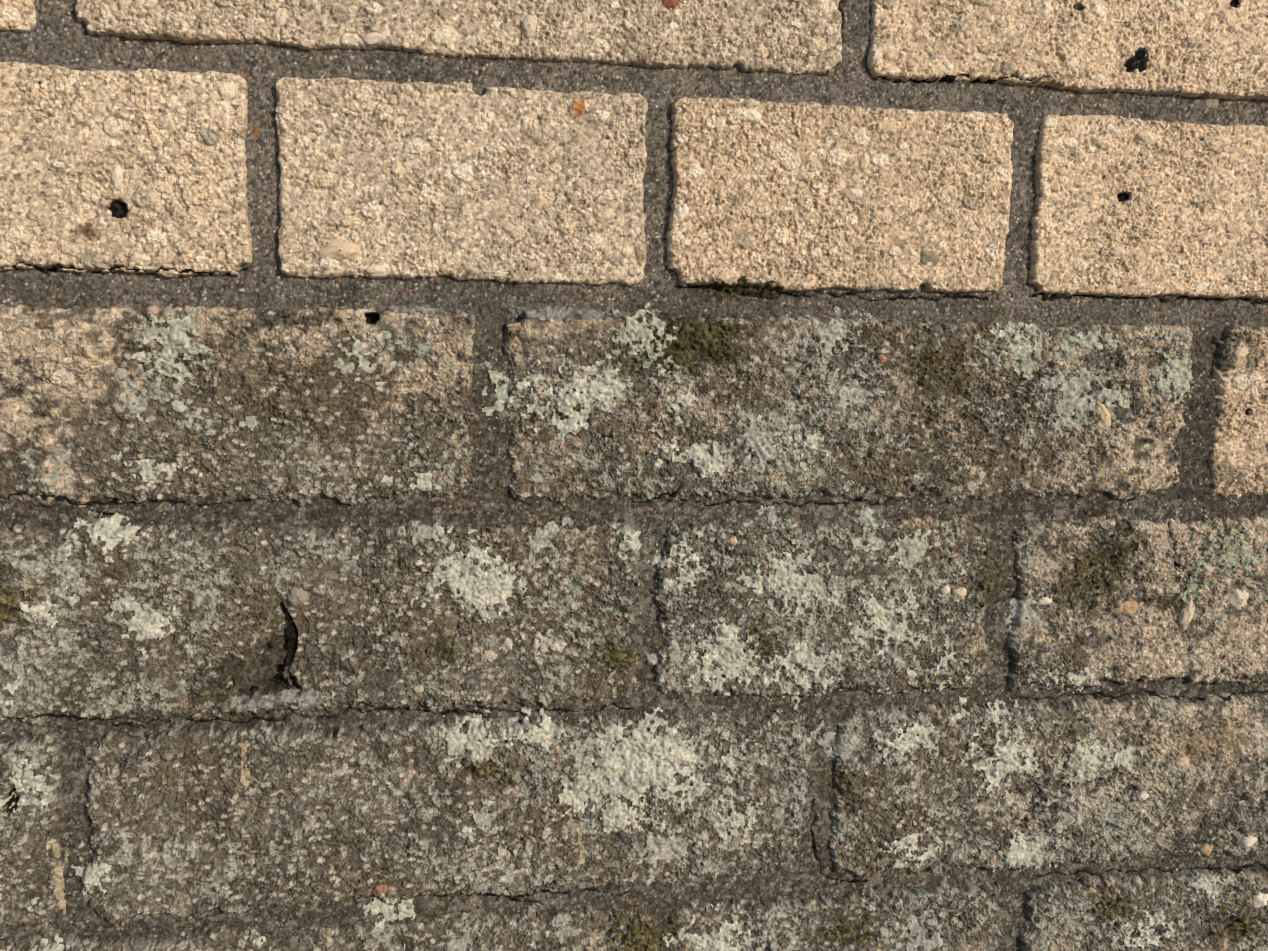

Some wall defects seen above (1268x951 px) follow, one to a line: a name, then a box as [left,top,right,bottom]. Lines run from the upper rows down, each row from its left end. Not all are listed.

spalling [196,604,330,713]
leakage [238,741,250,790]
leakage [568,812,586,866]
leakage [46,838,69,913]
leakage [326,928,334,951]
leakage [585,928,598,951]